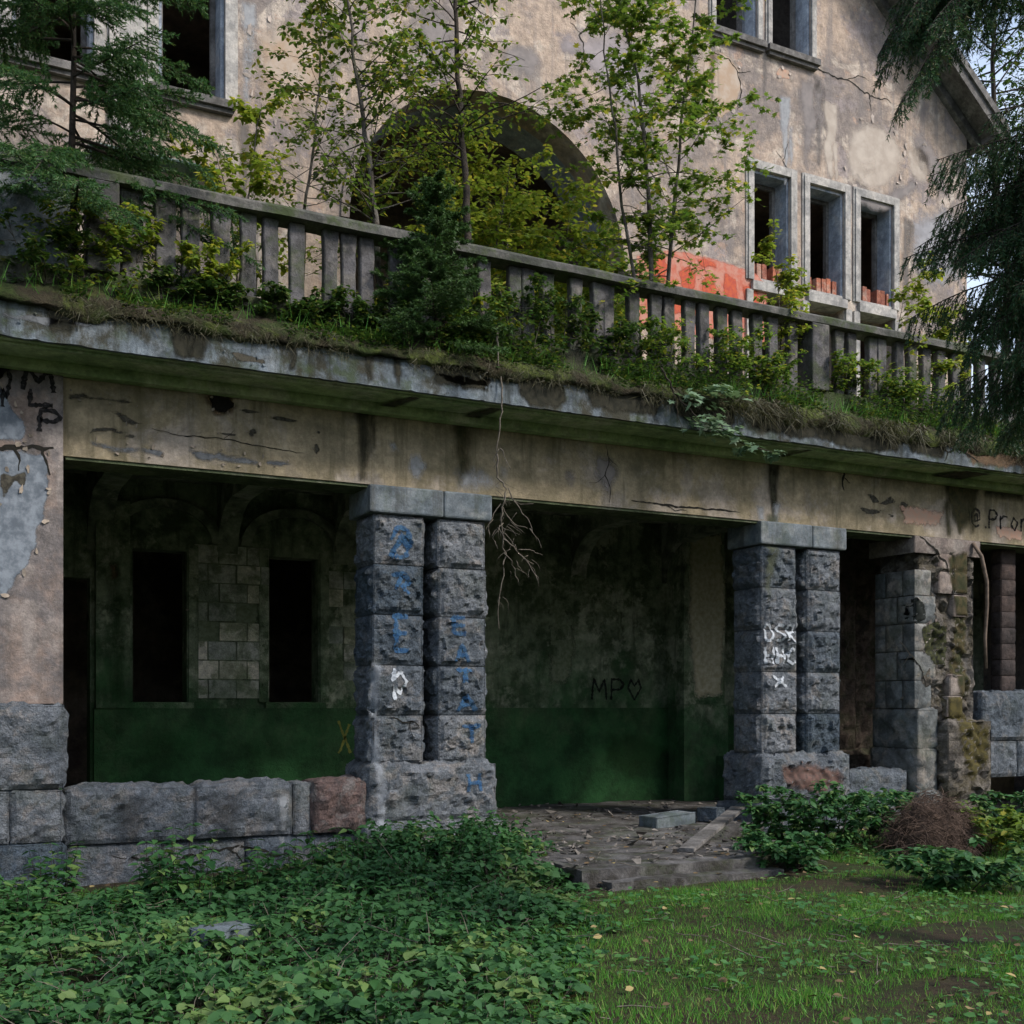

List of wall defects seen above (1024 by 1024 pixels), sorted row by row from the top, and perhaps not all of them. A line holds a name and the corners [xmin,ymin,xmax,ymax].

crack [714,52,750,99]
crack [818,68,891,111]
spalling [206,395,259,415]
peeling [0,381,51,598]
crack [152,428,296,453]
spalling [191,446,289,468]
crack [596,447,737,512]
peeling [861,494,944,526]
spalling [896,551,971,700]
water stain [940,696,990,780]